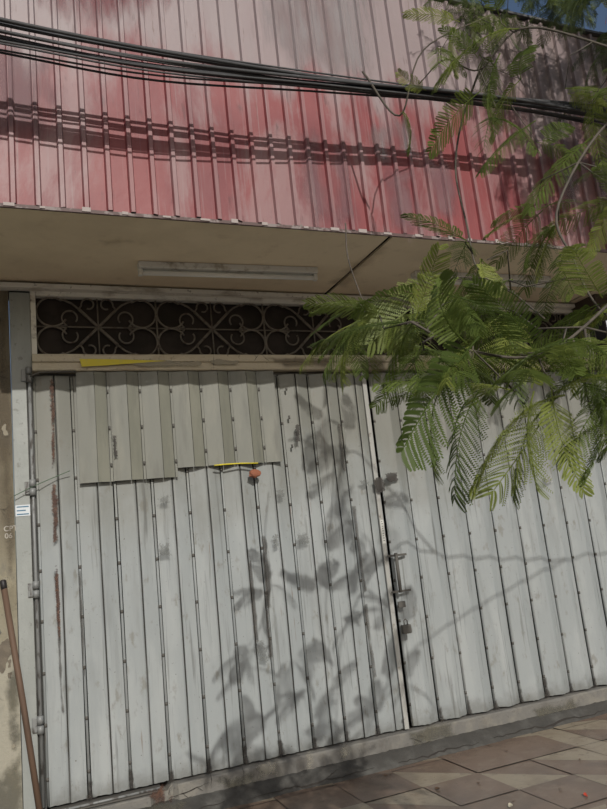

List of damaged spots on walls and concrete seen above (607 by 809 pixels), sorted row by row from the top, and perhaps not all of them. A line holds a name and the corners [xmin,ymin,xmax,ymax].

peeling [0,639,12,678]